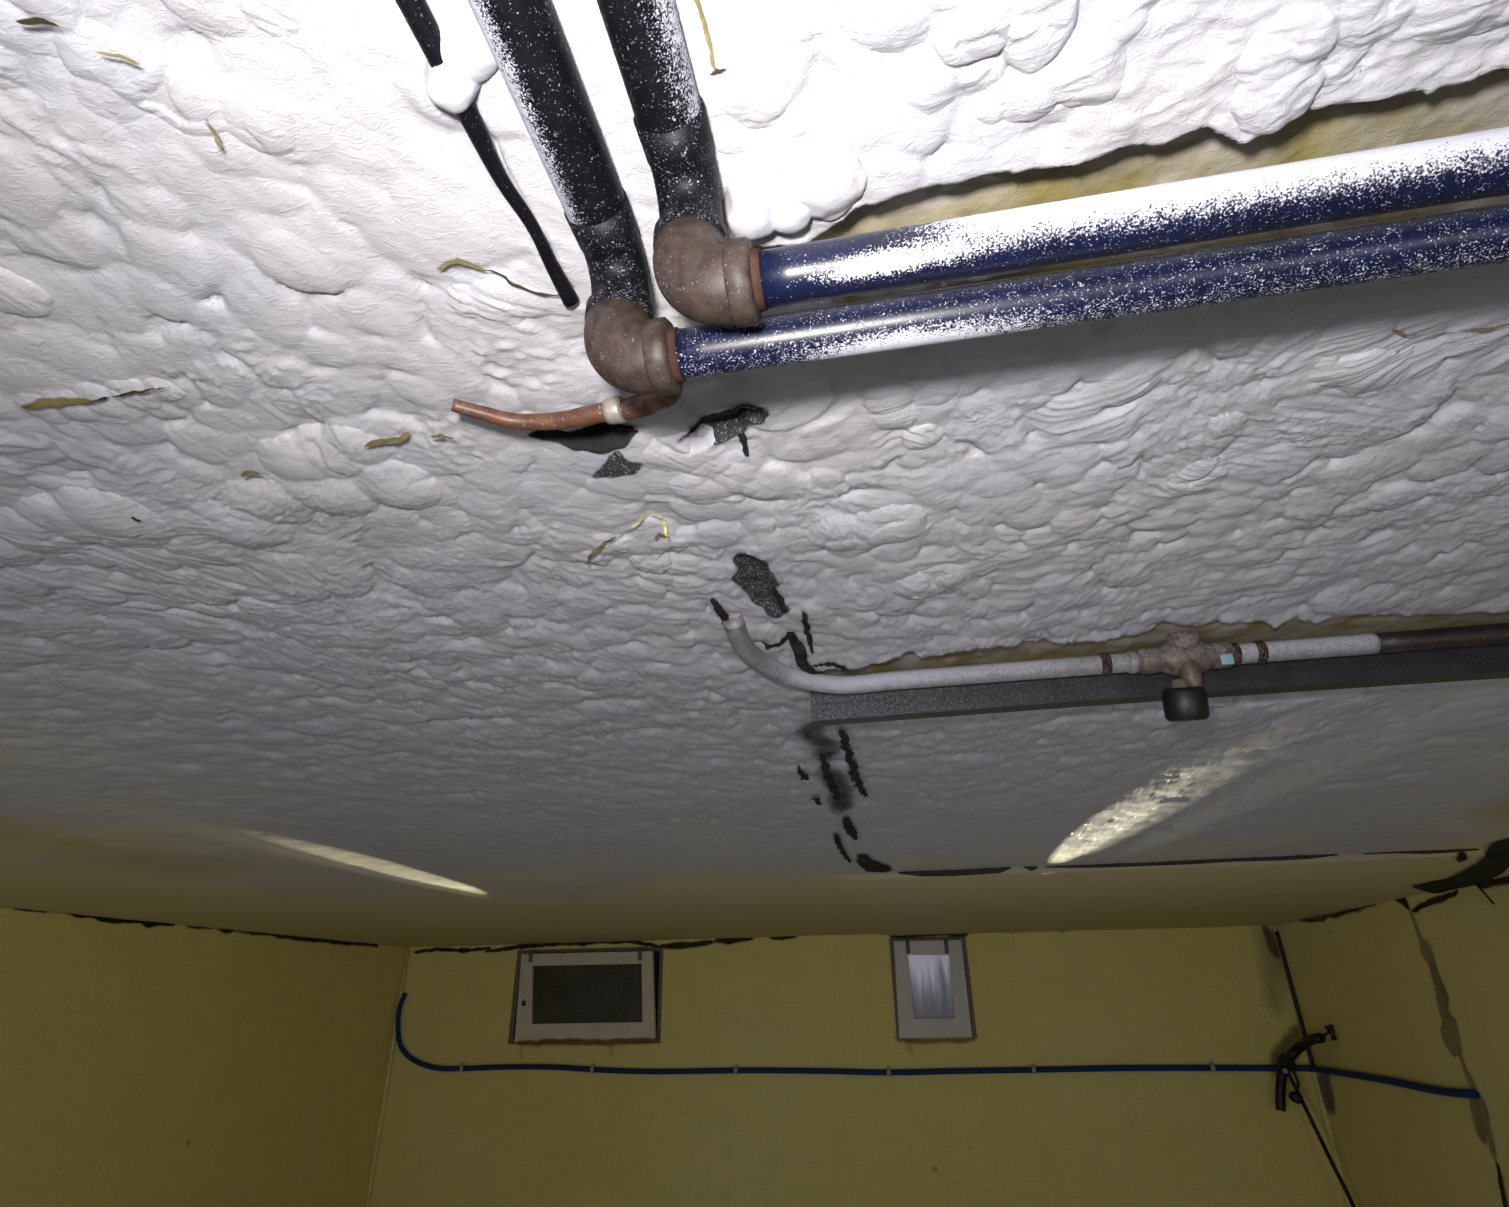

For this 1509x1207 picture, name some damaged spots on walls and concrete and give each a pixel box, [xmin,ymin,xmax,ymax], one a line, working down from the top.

peeling [593,451,643,478]
crack [797,723,1509,913]
crack [1478,1095,1508,1207]